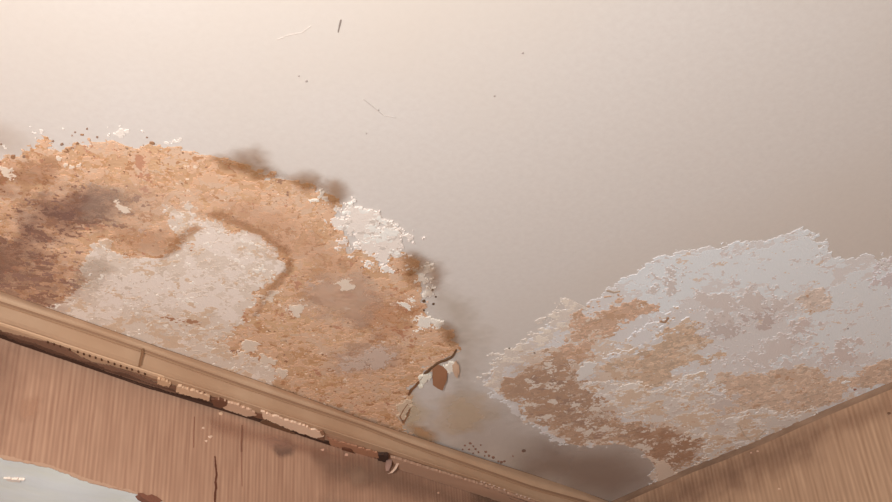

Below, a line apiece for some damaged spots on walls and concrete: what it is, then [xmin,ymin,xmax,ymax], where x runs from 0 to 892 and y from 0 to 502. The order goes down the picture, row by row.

crack [0,335,262,486]
crack [212,456,220,502]
peeling [0,125,461,439]
crack [292,430,339,448]
peeling [474,226,892,485]